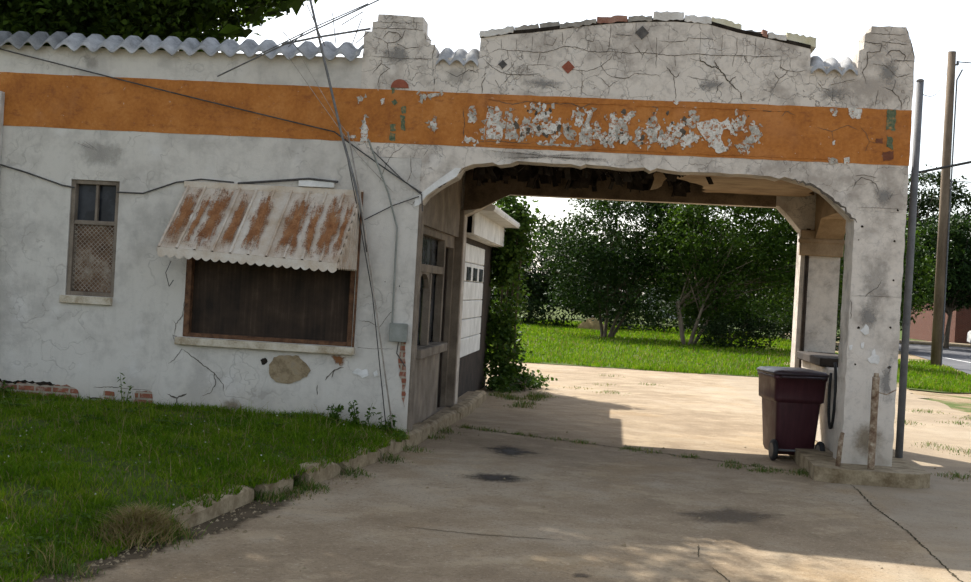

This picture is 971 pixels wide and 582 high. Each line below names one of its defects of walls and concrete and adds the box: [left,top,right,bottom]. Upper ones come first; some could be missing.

crack [373,20,914,117]
peeling [343,114,369,142]
peeling [380,88,406,141]
crack [463,110,532,144]
peeling [462,100,763,155]
rust [166,189,273,249]
flaking render [0,381,79,400]
crack [168,299,224,402]
flaking render [269,355,311,384]
flaking render [398,342,406,407]
crack [853,486,963,582]